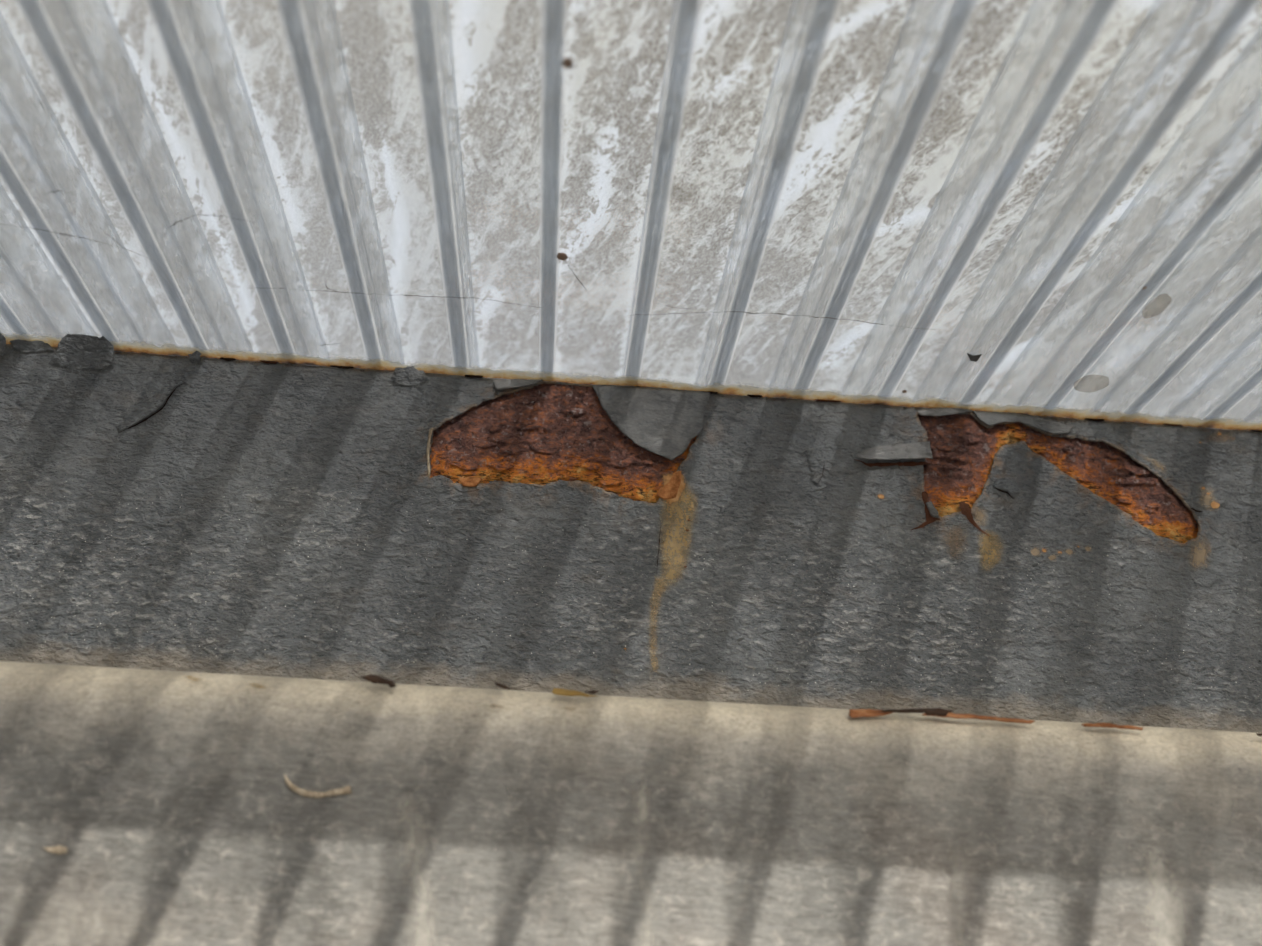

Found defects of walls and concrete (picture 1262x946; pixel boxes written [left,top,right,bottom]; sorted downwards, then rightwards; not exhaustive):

corrosion [3,333,62,347]
corrosion [109,340,1262,581]